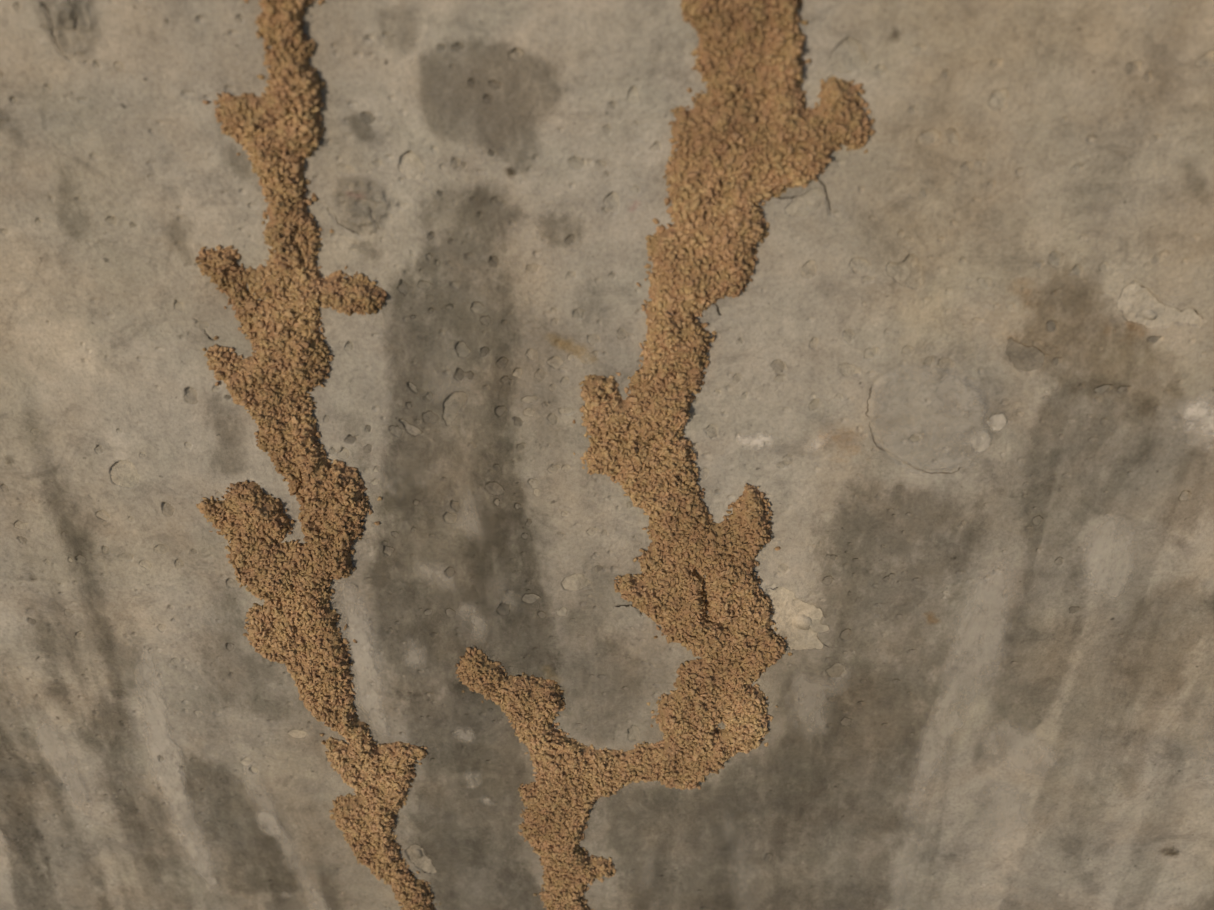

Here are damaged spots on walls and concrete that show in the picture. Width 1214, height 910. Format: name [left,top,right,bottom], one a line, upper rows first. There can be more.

water stain [1087,521,1131,596]
water stain [139,654,217,885]
water stain [914,569,1004,798]